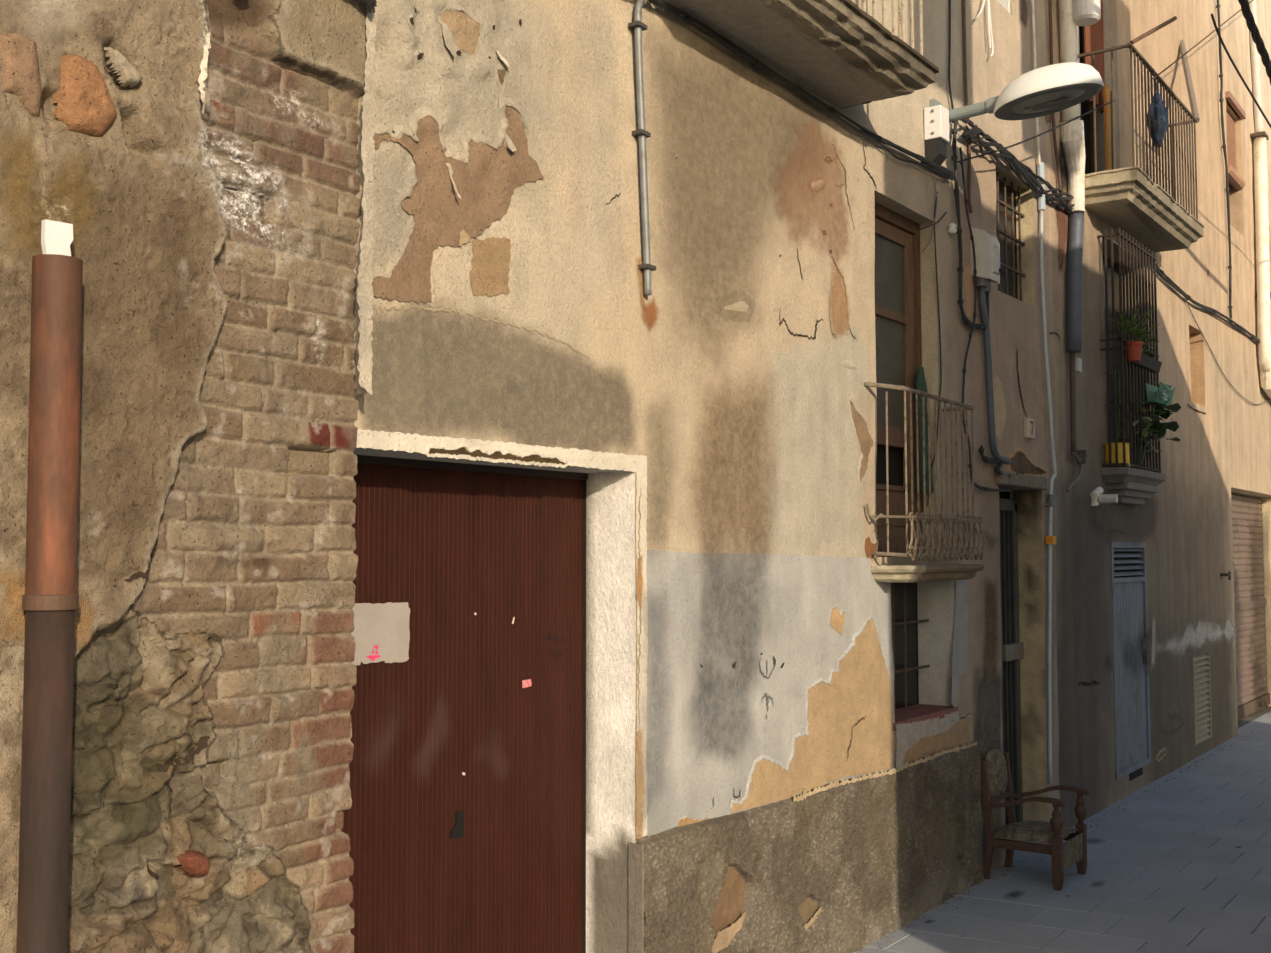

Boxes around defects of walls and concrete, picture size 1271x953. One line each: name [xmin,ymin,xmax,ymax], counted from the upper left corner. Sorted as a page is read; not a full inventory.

efflorescence [202,128,287,243]
leakage [666,68,848,333]
crack [831,143,876,232]
corrosion [639,260,657,328]
crack [777,255,857,343]
leakage [366,305,633,451]
flaking render [67,0,569,953]
leakage [701,402,767,550]
peeling [848,397,875,487]
flaking render [1007,447,1047,478]
peeling [730,604,970,813]